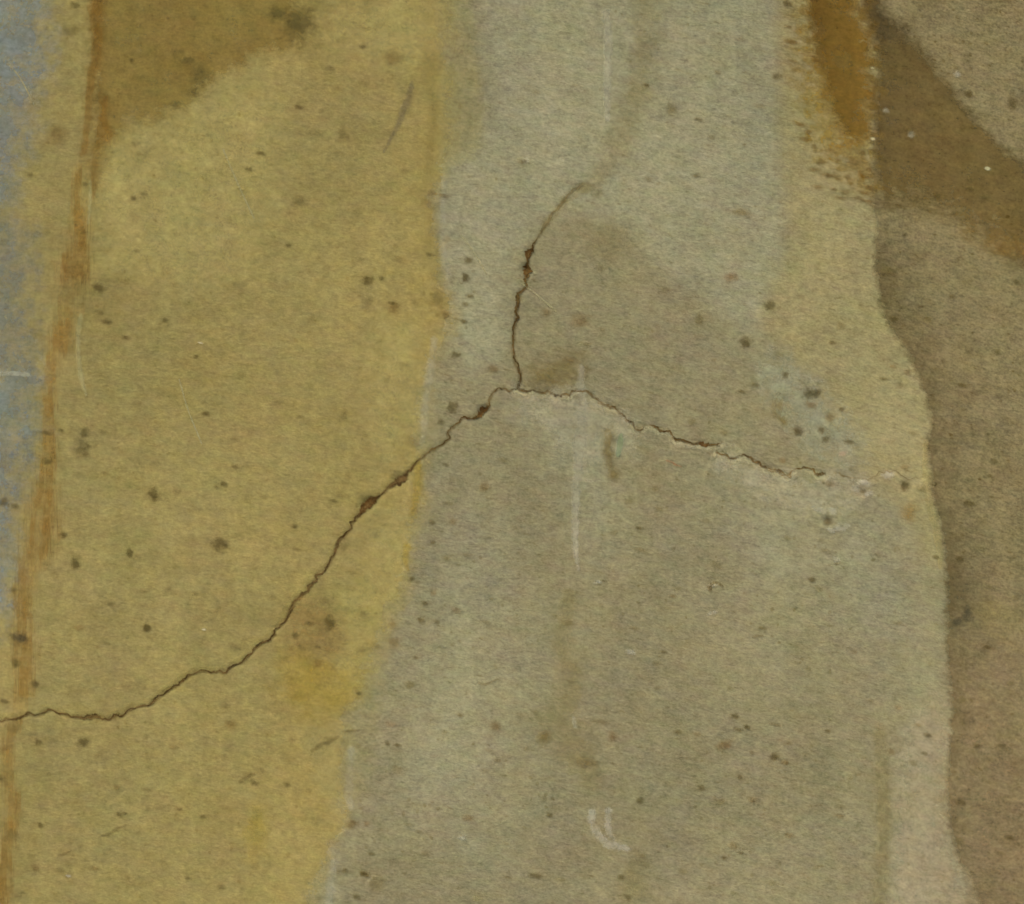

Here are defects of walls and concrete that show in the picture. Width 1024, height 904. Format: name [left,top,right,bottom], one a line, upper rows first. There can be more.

rust [799,0,875,160]
crack [0,185,917,722]
water stain [860,0,1024,904]